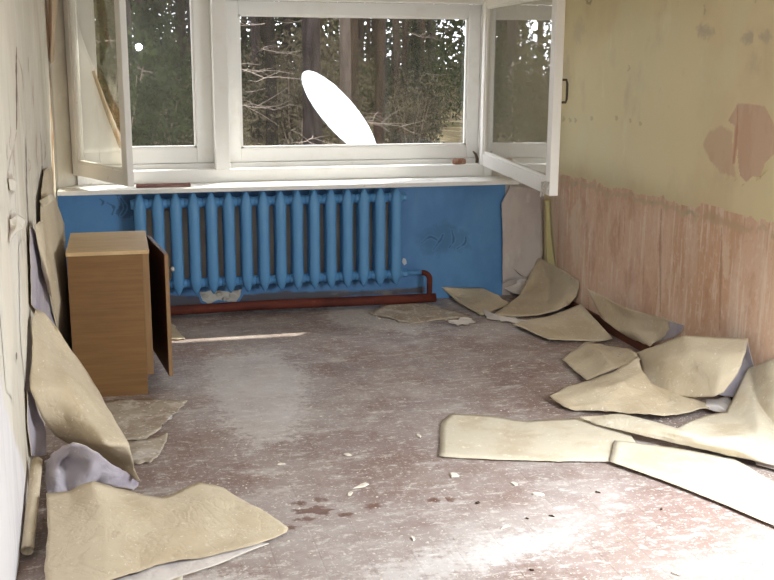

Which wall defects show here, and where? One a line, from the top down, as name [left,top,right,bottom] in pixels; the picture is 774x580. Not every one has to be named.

peeling [698,101,774,186]